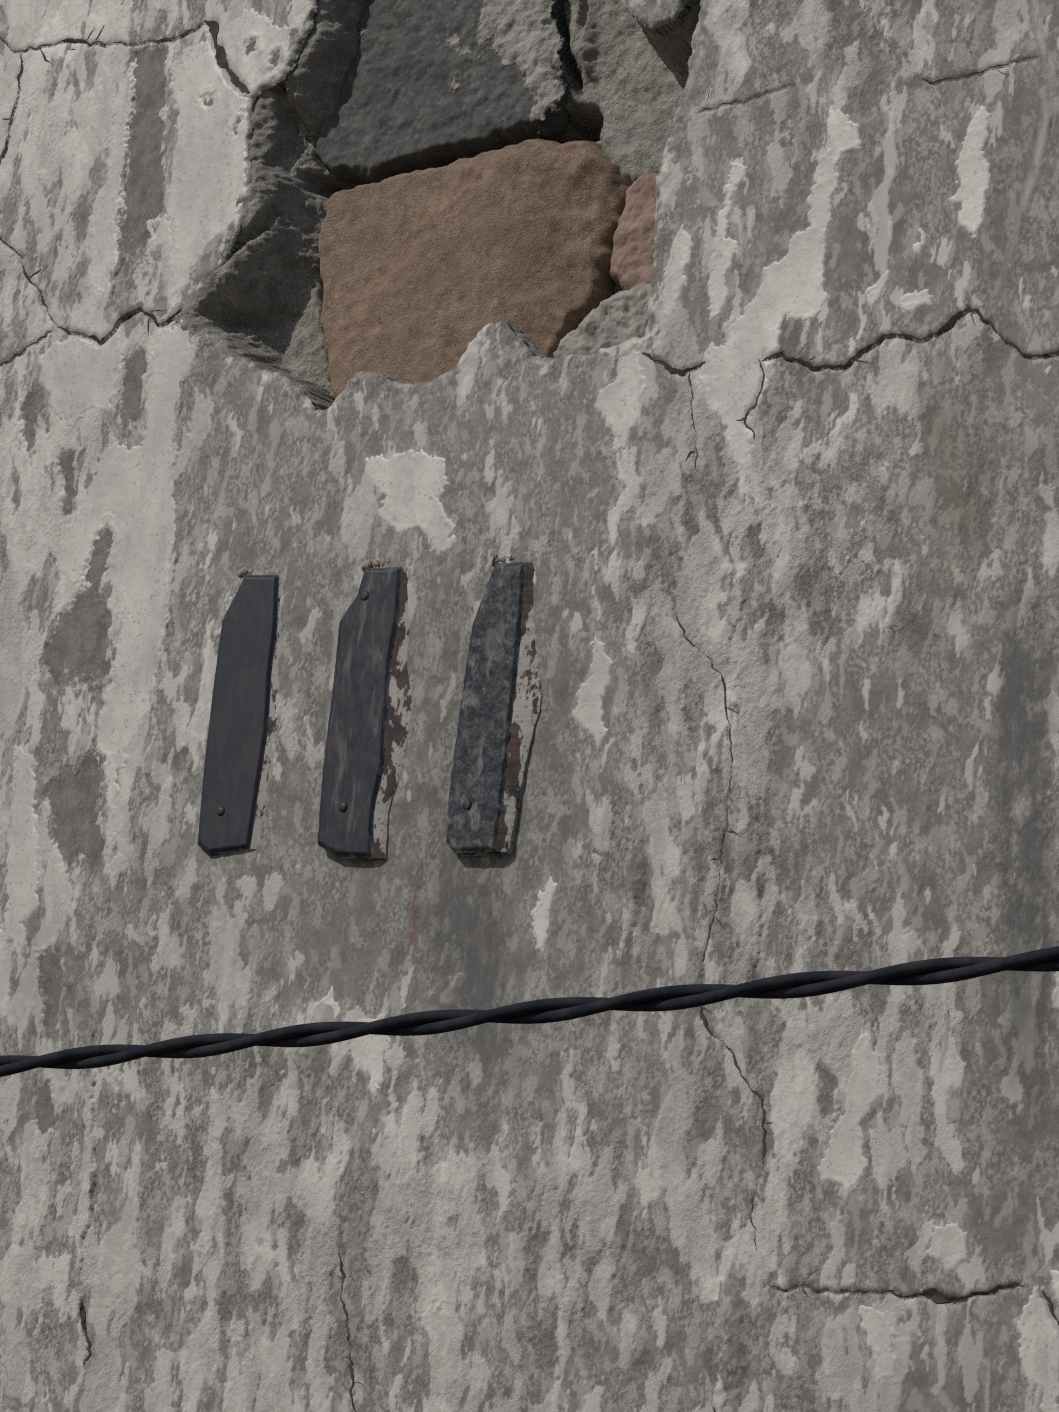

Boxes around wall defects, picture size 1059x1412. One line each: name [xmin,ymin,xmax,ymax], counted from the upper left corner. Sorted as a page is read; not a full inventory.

crack [0,20,249,158]
crack [0,237,183,373]
peeling [698,106,862,479]
crack [737,306,1059,437]
spalling [0,0,701,960]
peeling [39,948,63,1047]
crack [676,616,778,1247]
peeling [35,1085,58,1134]
crack [79,1302,91,1364]
crack [338,1253,363,1411]
crack [768,1269,1059,1326]